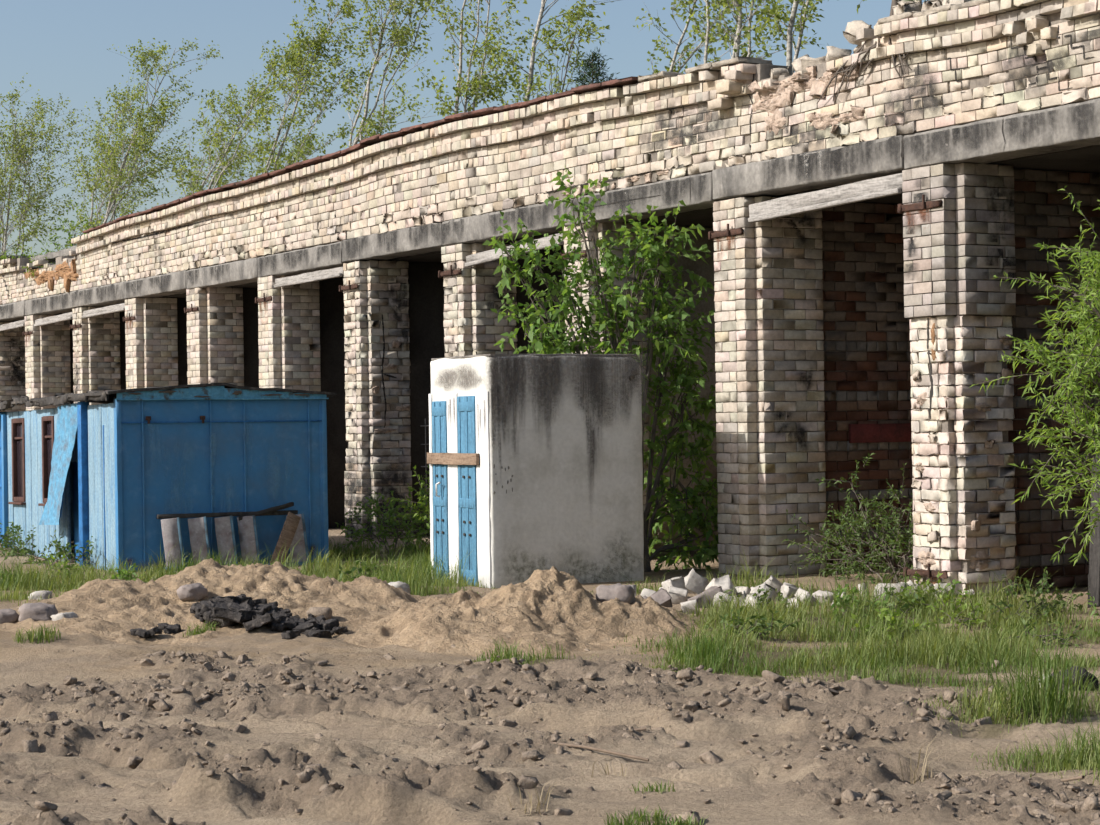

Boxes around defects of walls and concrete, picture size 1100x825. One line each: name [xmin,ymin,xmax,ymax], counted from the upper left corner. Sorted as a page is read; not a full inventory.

spalling [748,65,865,136]
leakage [768,111,994,180]
leakage [881,67,943,123]
leakage [1006,110,1055,142]
leakage [1073,103,1093,129]
leakage [438,354,644,450]